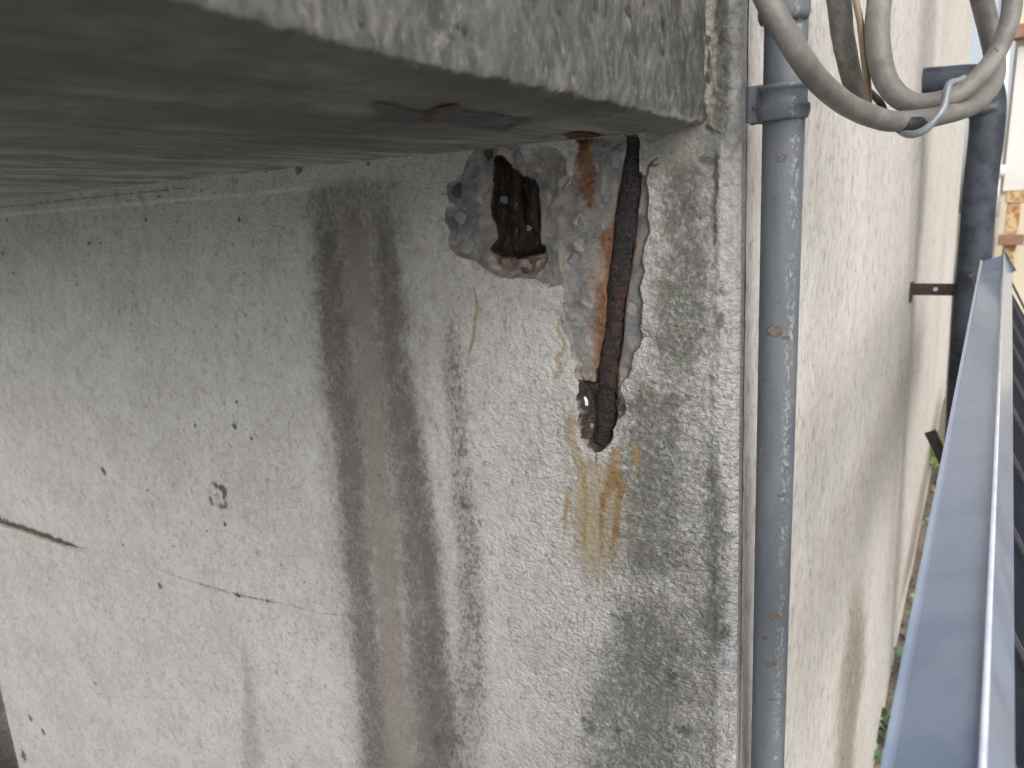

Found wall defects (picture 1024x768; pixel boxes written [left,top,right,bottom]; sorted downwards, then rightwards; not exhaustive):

spalling [444,134,650,453]
rust [565,132,602,206]
crack [0,518,79,552]
water stain [319,228,385,768]
water stain [379,232,483,768]
rust [567,415,625,575]